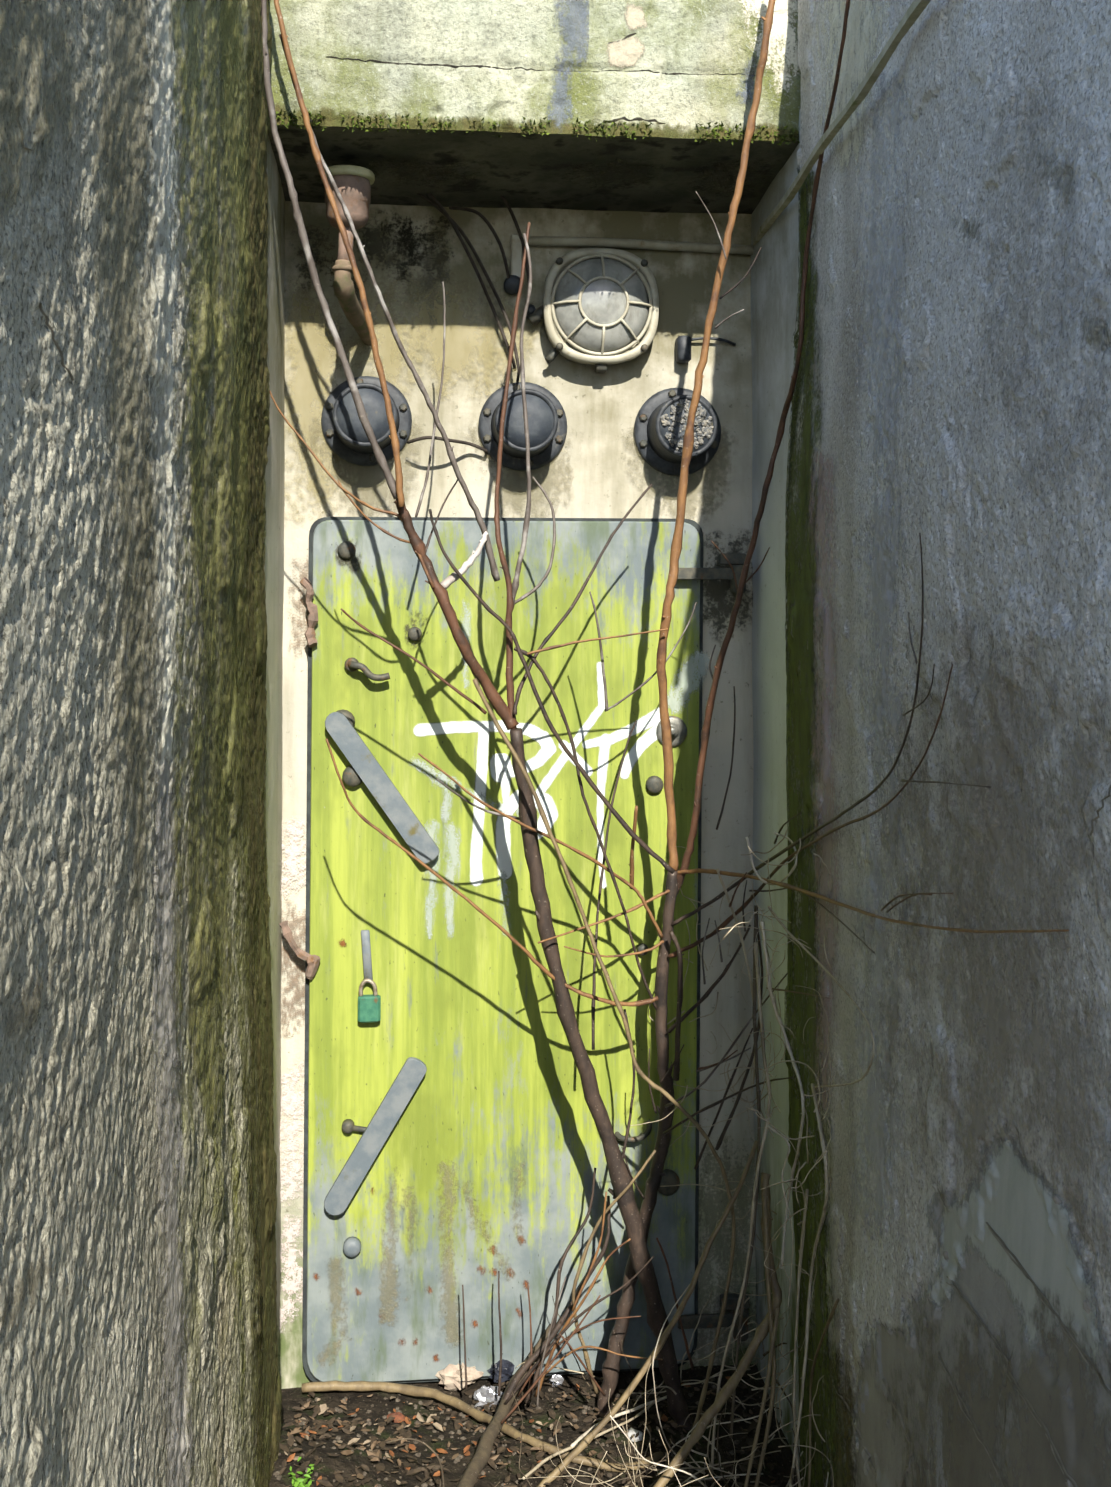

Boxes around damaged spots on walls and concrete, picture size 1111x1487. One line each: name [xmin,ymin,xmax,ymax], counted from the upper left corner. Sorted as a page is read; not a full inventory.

leakage [548,0,589,134]
crack [38,303,74,381]
leakage [284,211,531,511]
peeling [833,1136,1111,1487]